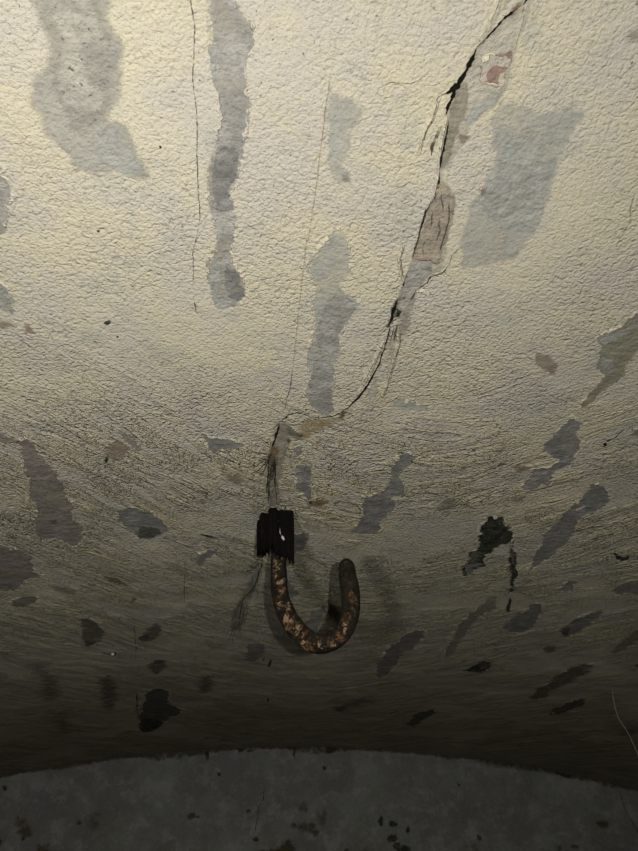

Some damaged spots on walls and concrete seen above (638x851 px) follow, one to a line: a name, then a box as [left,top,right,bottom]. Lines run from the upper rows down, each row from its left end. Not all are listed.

crack [270,0,527,449]
peeling [398,0,530,315]